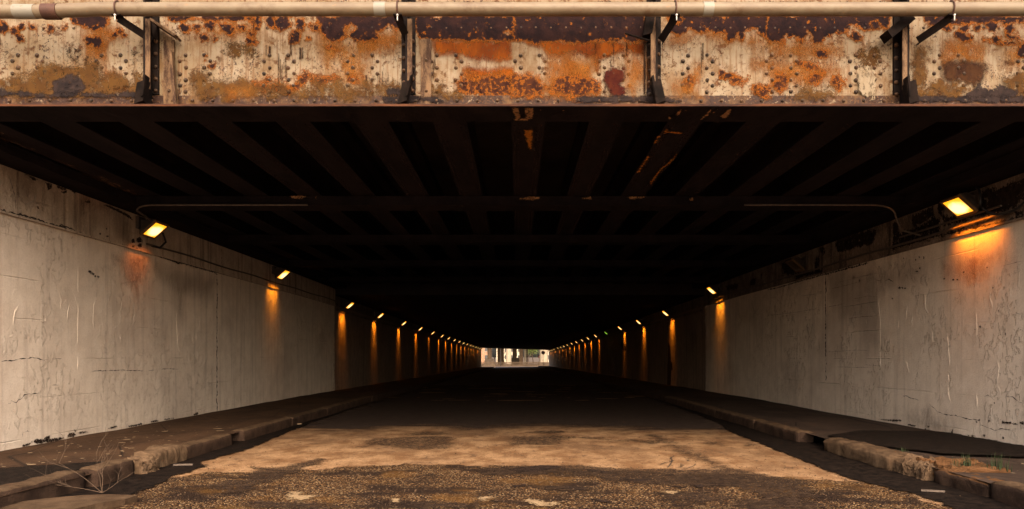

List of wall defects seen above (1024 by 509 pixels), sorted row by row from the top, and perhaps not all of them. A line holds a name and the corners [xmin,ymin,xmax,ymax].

corrosion [0,27,155,102]
corrosion [188,23,402,104]
corrosion [431,39,514,100]
corrosion [526,40,647,96]
corrosion [670,32,882,103]
corrosion [909,45,971,98]
corrosion [999,47,1024,98]
crack [1,169,218,409]
crack [768,217,1016,378]